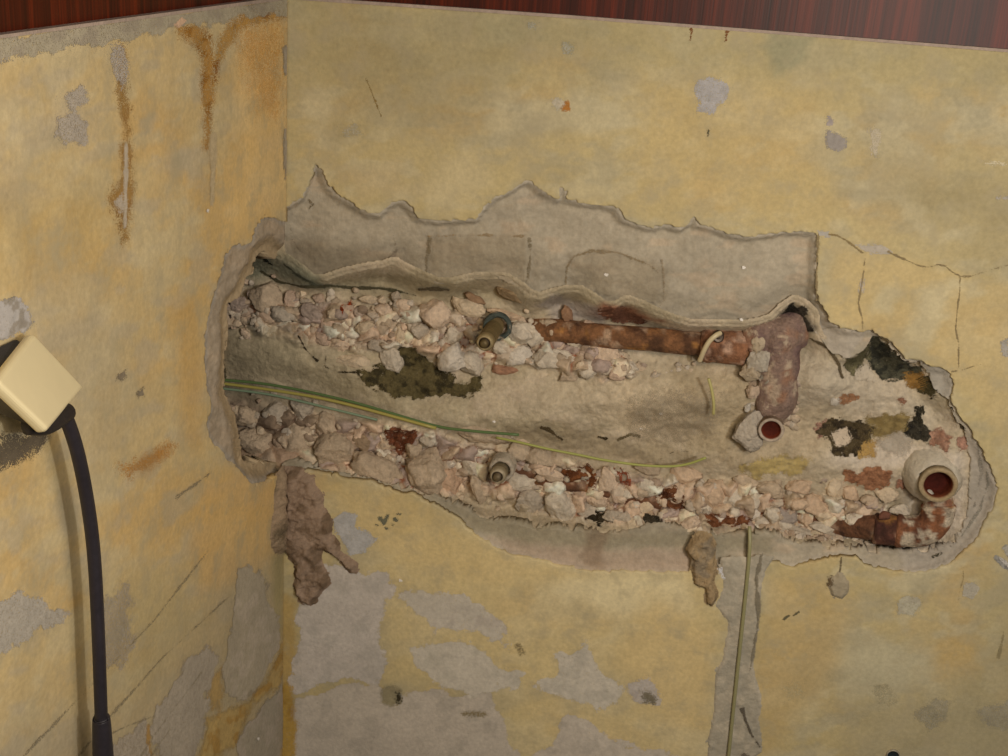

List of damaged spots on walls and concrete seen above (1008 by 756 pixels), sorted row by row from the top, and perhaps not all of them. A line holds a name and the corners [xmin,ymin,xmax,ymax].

water stain [104,41,137,248]
water stain [175,3,288,206]
spalling [204,165,998,607]
crack [815,230,1008,372]
water stain [199,641,300,756]
peeling [625,677,661,706]